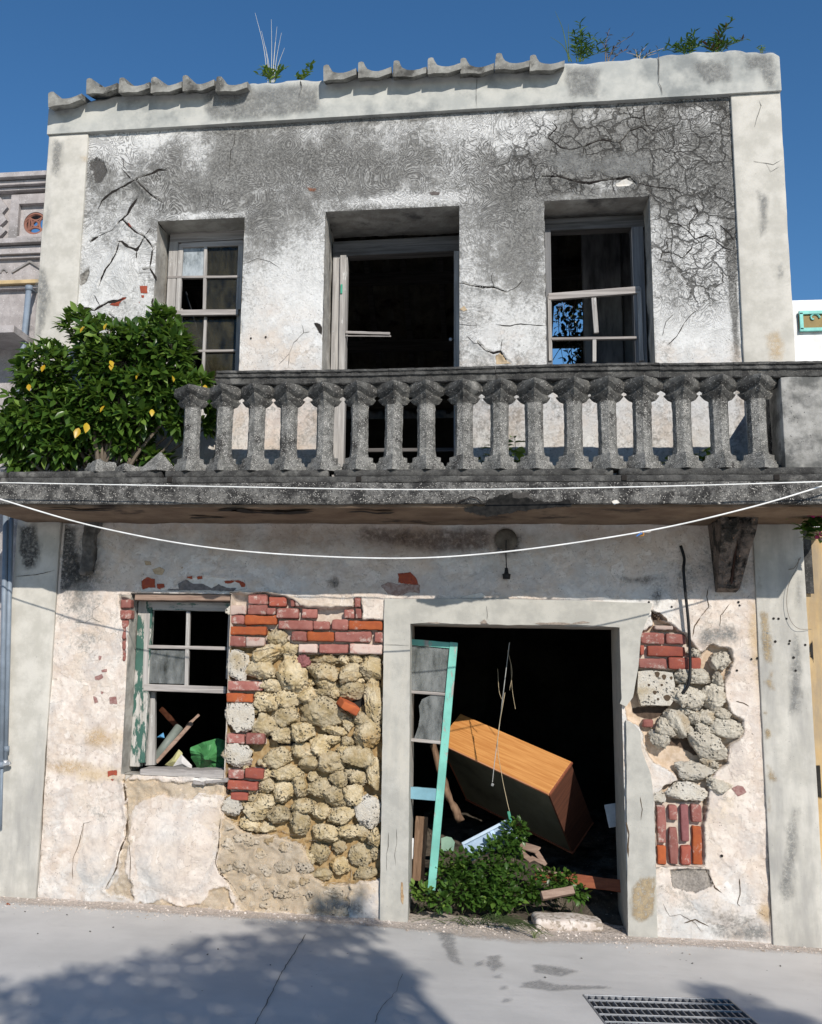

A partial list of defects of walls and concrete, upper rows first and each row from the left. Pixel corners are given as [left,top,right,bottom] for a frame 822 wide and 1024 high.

crack [543,54,734,260]
crack [84,161,167,322]
crack [462,273,522,292]
crack [462,323,544,360]
peeling [381,572,420,596]
spalling [108,561,384,916]
spalling [625,611,746,893]